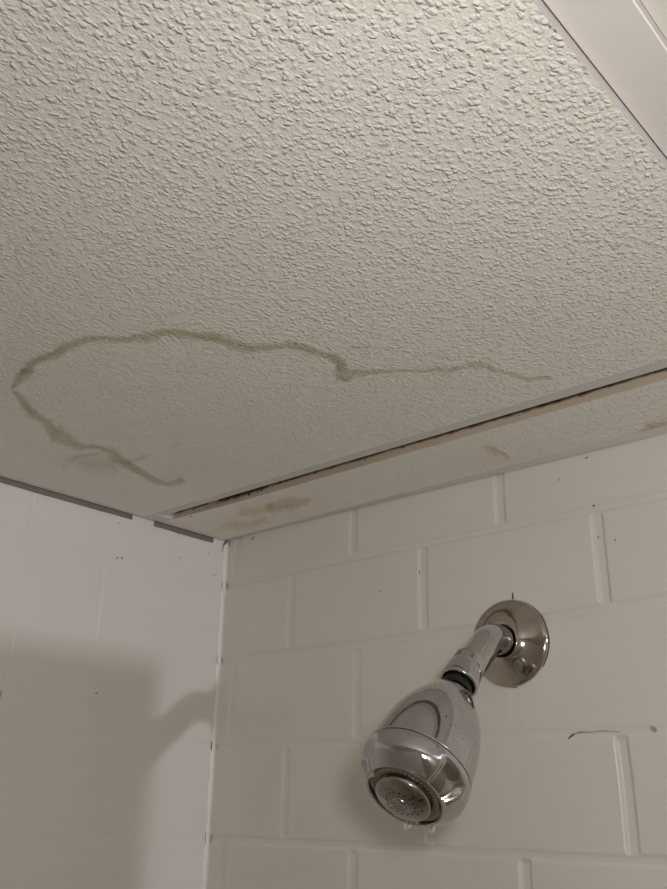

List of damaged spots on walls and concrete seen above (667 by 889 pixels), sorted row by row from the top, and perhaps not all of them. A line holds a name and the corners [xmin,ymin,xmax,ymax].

leakage [399,368,667,448]
leakage [177,451,385,513]